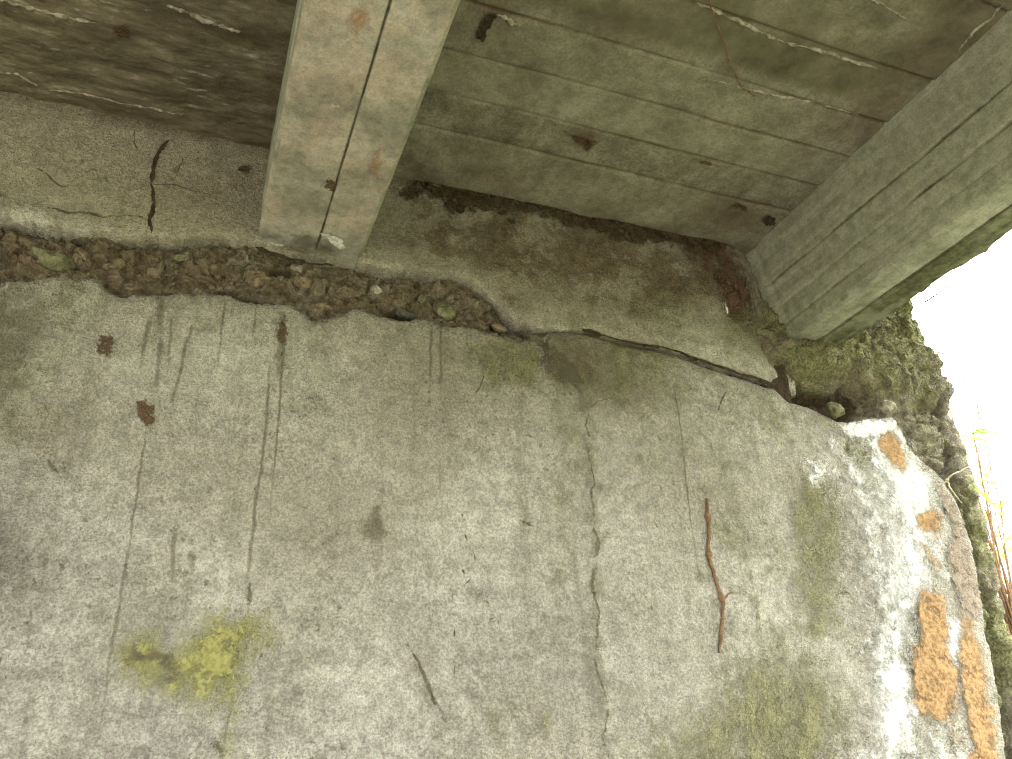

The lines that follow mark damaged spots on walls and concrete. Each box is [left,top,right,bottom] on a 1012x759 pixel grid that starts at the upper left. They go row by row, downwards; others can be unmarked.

crack [39,132,198,233]
rust [96,335,113,357]
rust [136,399,155,426]
leakage [142,300,172,356]
leakage [248,314,286,565]
spalling [0,226,584,396]
crack [582,329,792,410]
crack [561,370,616,757]
leakage [842,419,998,759]